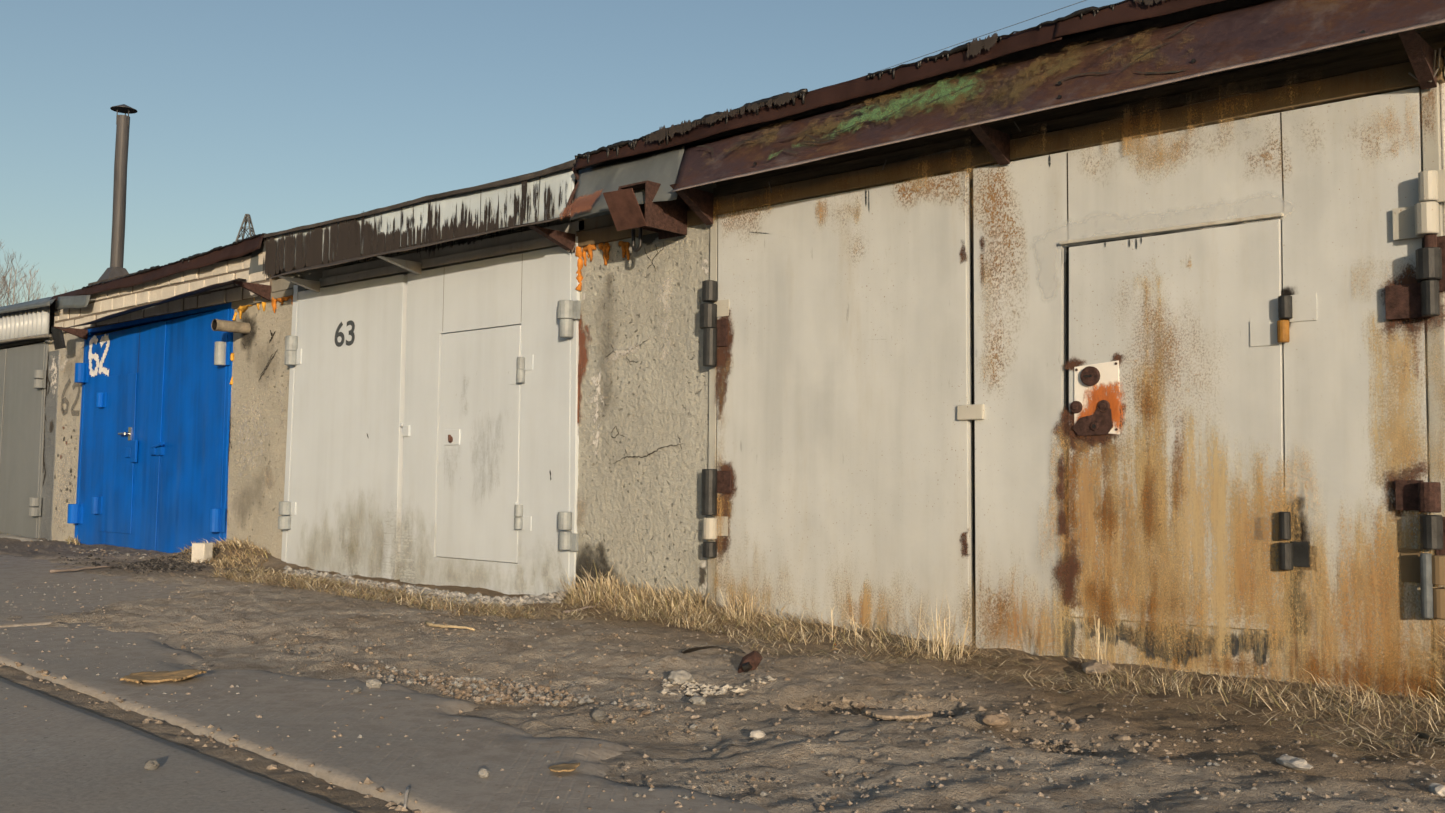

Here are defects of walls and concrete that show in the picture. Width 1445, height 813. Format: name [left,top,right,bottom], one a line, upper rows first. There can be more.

rust [895,168,1024,288]
rust [1382,265,1421,303]
rust [715,310,734,419]
rust [715,463,770,609]
rust [960,532,969,557]
rust [964,280,1445,702]
rust [842,583,899,632]